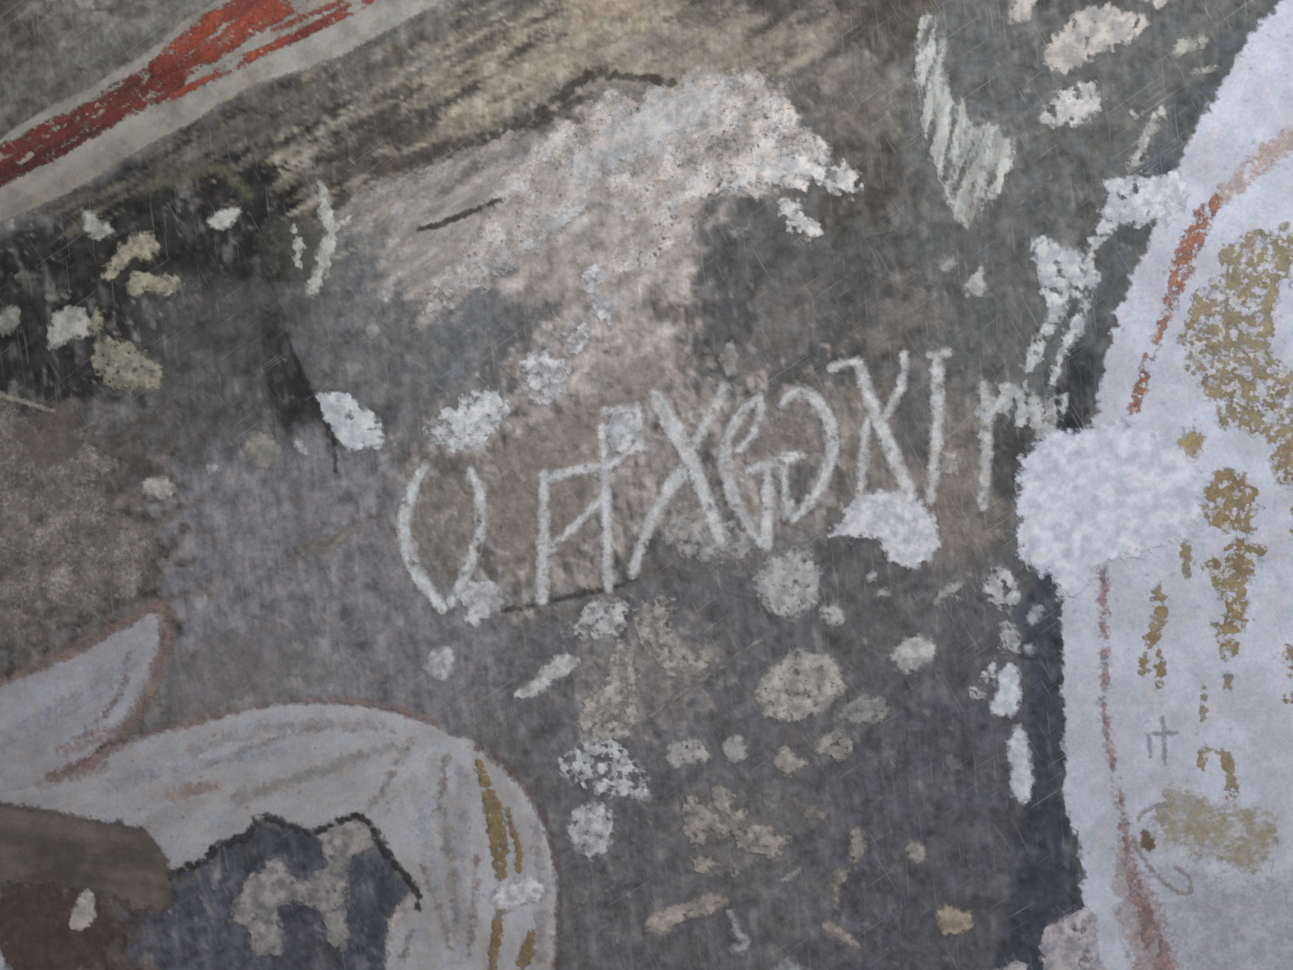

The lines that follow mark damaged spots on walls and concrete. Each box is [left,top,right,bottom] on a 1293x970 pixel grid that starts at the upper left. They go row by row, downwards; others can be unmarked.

flaking render [1040,0,1167,129]
flaking render [83,210,179,297]
flaking render [207,208,241,230]
damp [257,133,536,309]
flaking render [45,293,163,394]
flaking render [315,392,384,452]
flaking render [827,489,941,569]
flaking render [752,546,846,626]
flaking render [514,653,581,699]
flaking render [558,594,713,862]
flaking render [754,647,890,777]
flaking render [890,634,936,674]